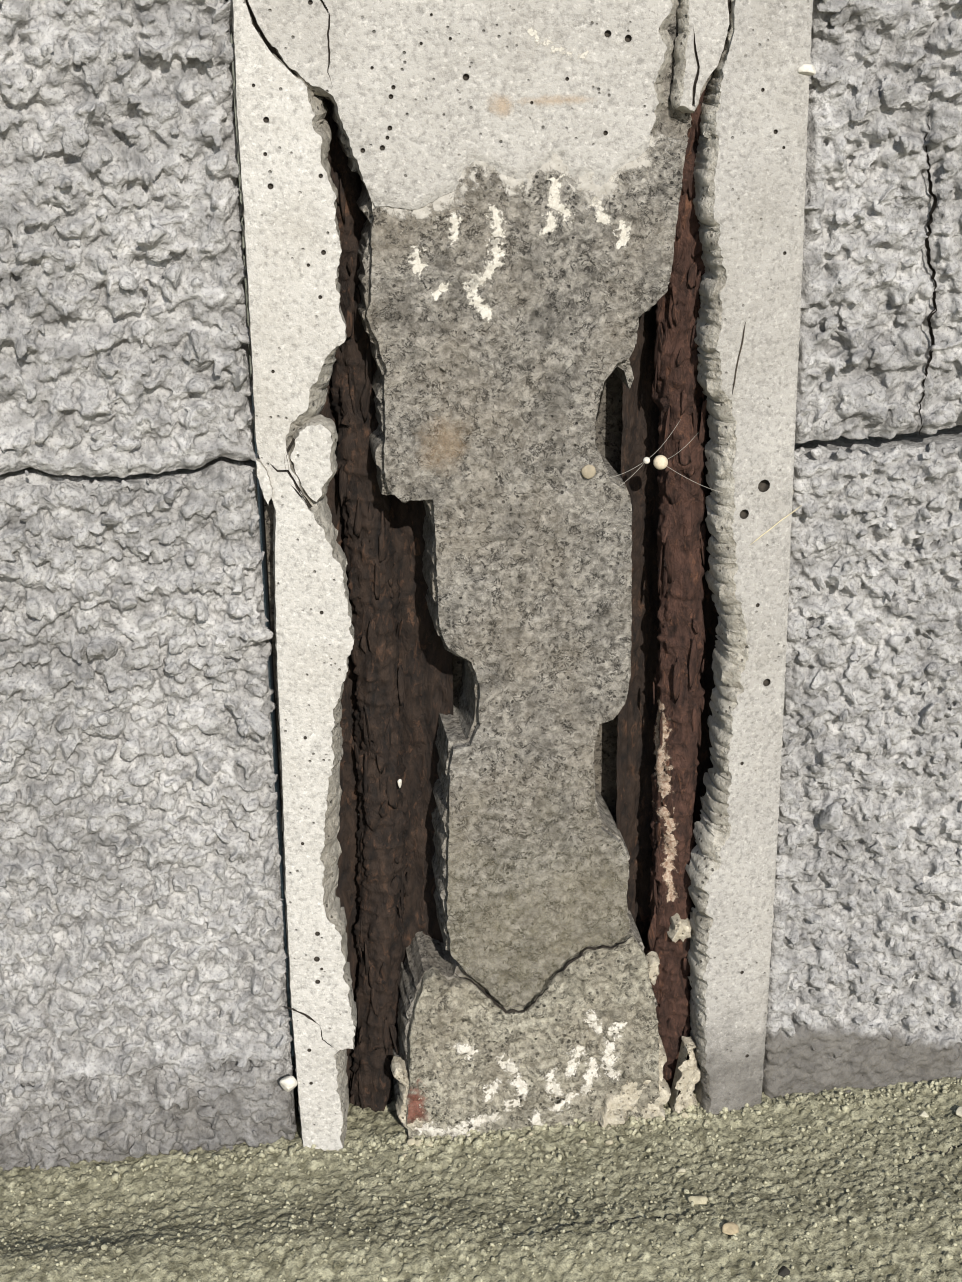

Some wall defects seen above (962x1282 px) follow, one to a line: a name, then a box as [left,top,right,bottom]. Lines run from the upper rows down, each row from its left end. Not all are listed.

crack [245,0,294,72]
crack [321,0,332,84]
crack [692,0,731,104]
rust [682,173,696,200]
rust [652,216,702,397]
crack [271,438,312,509]
rust [663,370,707,505]
spalling [231,0,360,1151]
peeling [365,0,813,1140]
rust [658,538,675,596]
rust [644,618,706,978]
crack [455,936,632,1014]